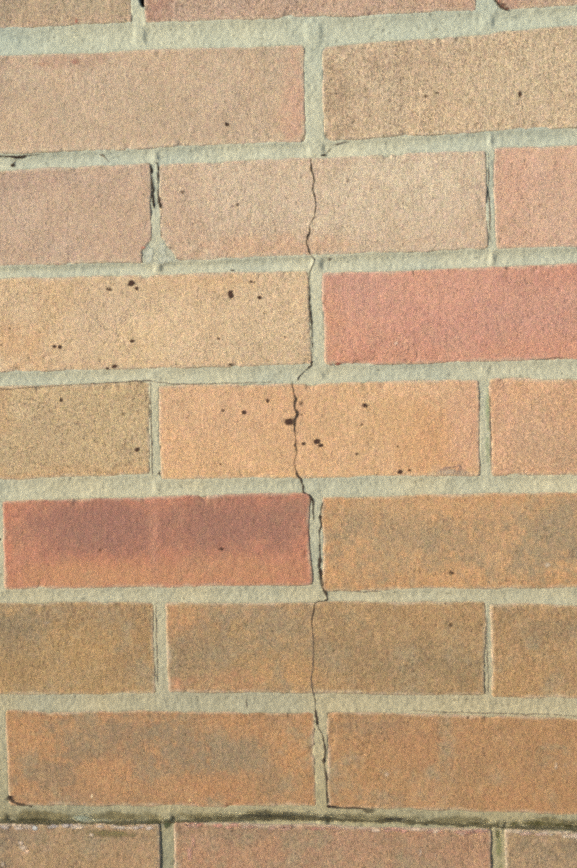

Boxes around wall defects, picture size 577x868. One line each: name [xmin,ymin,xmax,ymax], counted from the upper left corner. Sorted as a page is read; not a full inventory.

crack [4,141,368,810]
water stain [0,809,577,860]